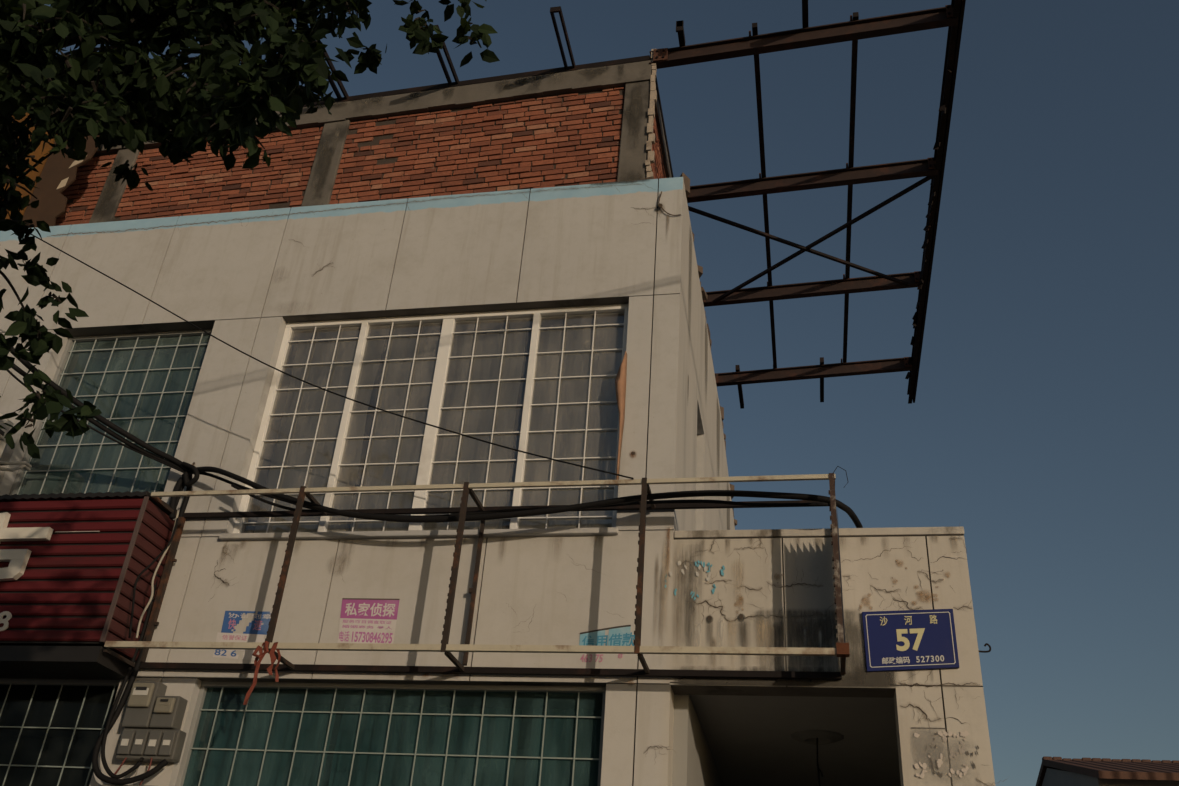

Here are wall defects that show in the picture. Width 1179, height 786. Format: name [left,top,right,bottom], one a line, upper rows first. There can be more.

crack [682,521,972,622]
leakage [678,610,895,687]
crack [900,670,980,737]
peeling [914,731,969,778]